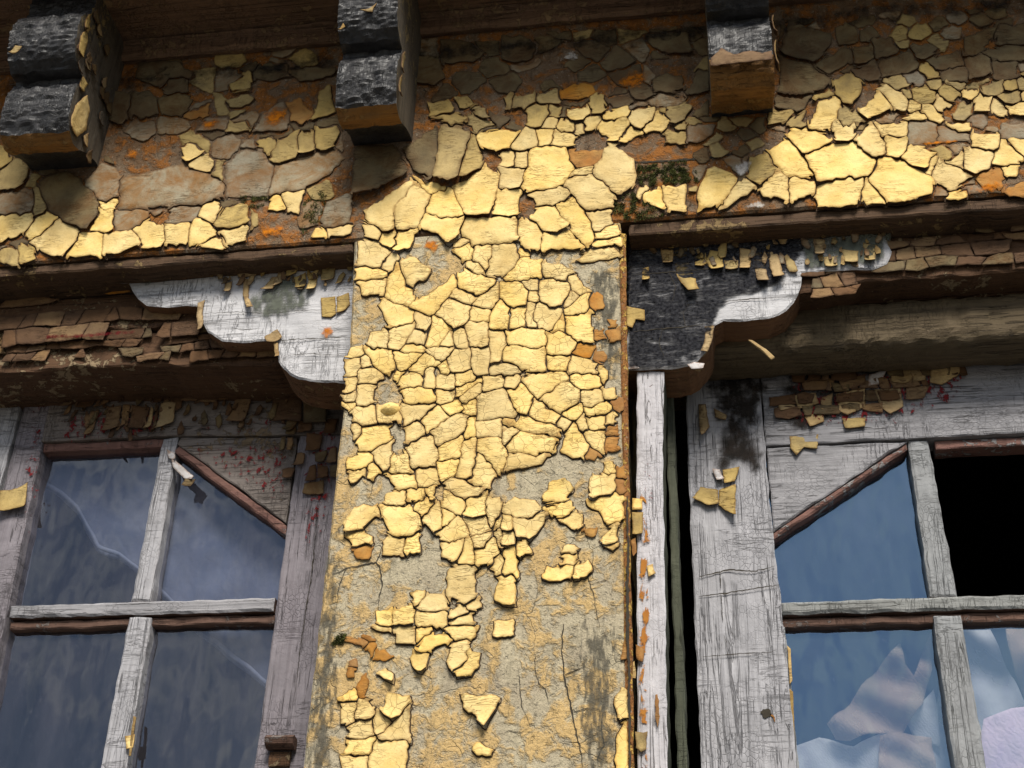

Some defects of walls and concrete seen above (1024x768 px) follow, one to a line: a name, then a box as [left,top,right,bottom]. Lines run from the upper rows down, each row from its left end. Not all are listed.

peeling [71,9,103,164]
peeling [0,48,408,272]
peeling [0,290,282,363]
peeling [260,268,336,290]
peeling [321,293,350,318]
peeling [340,8,1024,686]
peeling [60,396,338,495]
water stain [709,378,767,475]
peeling [337,658,414,768]
peeling [459,692,502,758]
crack [496,624,603,767]
peeling [613,687,660,768]